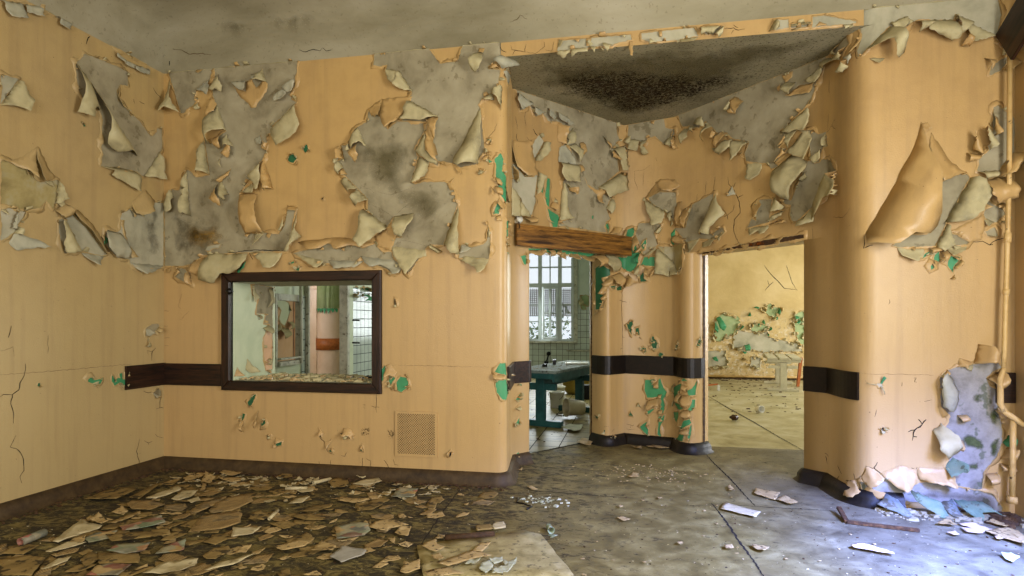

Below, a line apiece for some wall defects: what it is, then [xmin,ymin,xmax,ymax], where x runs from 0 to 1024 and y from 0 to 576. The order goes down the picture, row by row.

mould [559,48,782,111]
peeling [0,0,1024,315]
peeling [625,319,679,358]
peeling [695,303,804,370]
crack [3,329,26,483]
peeling [82,371,130,390]
peeling [238,393,284,448]
peeling [382,364,412,393]
peeling [491,362,524,427]
peeling [628,377,700,448]
peeling [843,344,1020,512]